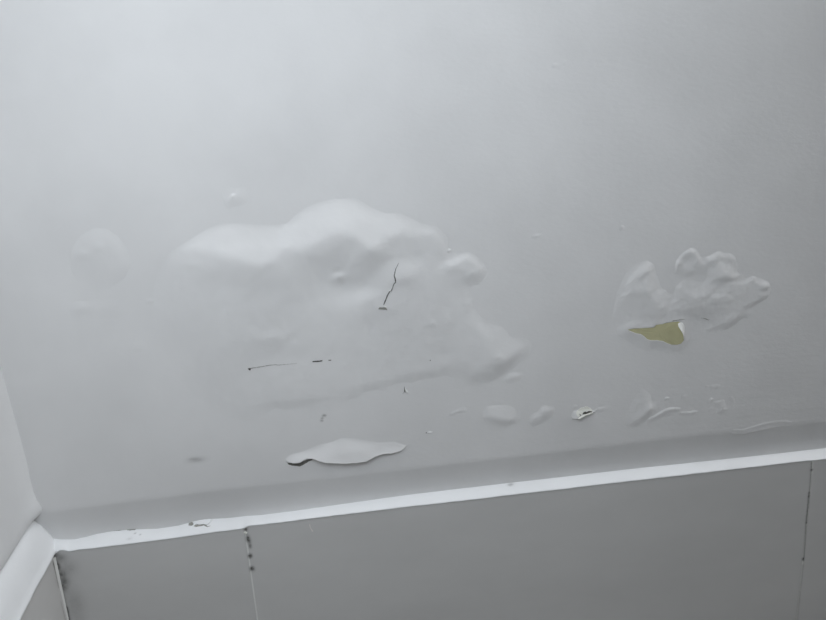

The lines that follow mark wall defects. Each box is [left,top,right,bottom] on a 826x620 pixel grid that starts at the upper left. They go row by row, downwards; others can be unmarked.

crack [379,263,399,310]
peeling [628,319,685,345]